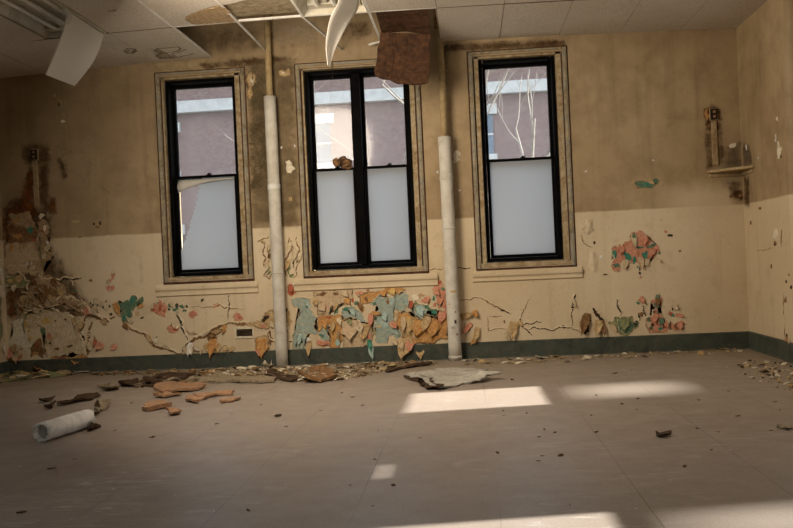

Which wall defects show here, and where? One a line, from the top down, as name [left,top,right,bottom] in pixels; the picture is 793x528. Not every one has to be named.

peeling [186,7,235,25]
peeling [257,236,272,279]
peeling [603,229,662,278]
peeling [0,211,198,365]
crack [9,257,293,357]
peeling [233,309,274,359]
peeling [283,237,448,361]
crack [459,293,581,336]
peeling [579,293,687,336]